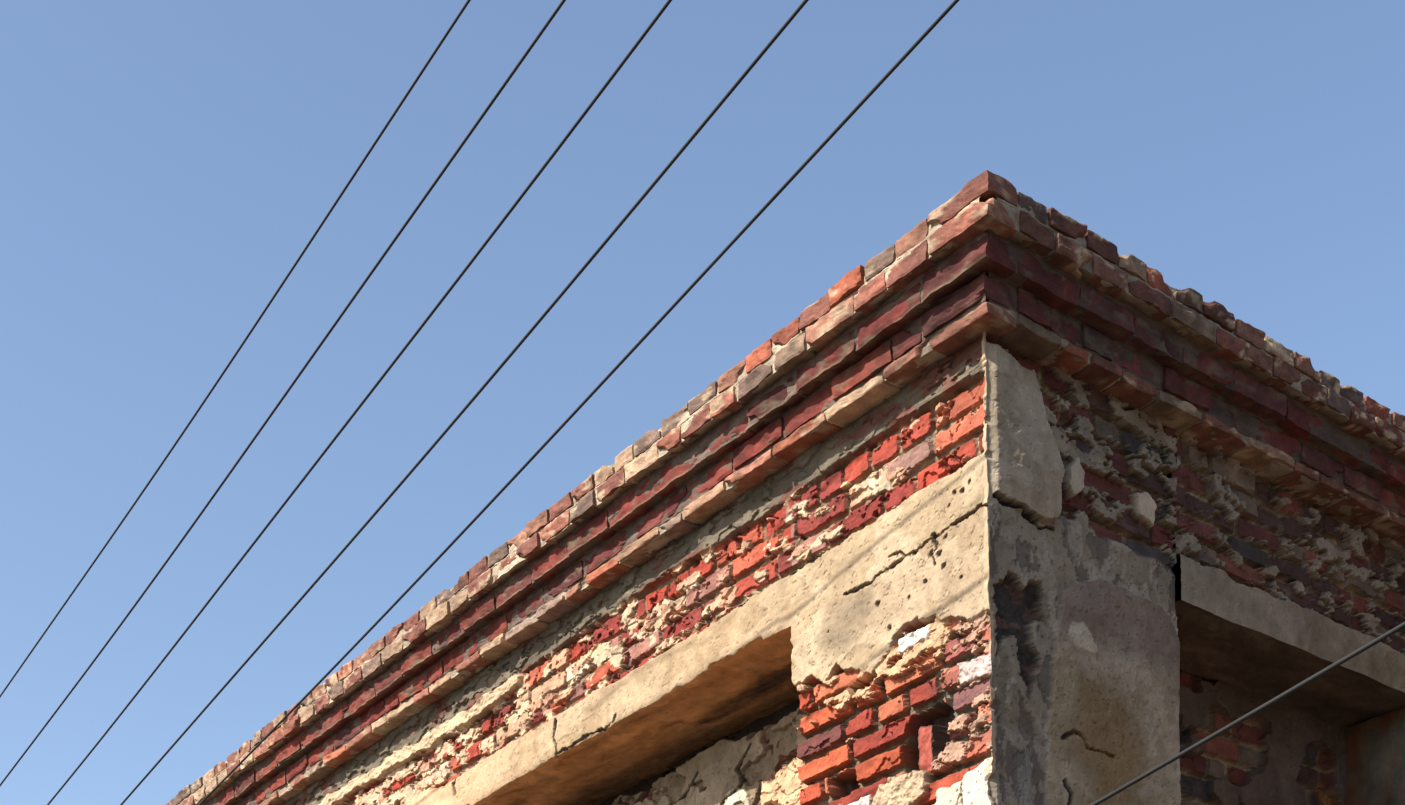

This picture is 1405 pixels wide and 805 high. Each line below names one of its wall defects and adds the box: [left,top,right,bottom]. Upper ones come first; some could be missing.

spalling [331,371,986,805]
crack [791,535,848,571]
crack [843,490,1055,595]
spalling [635,573,1273,805]